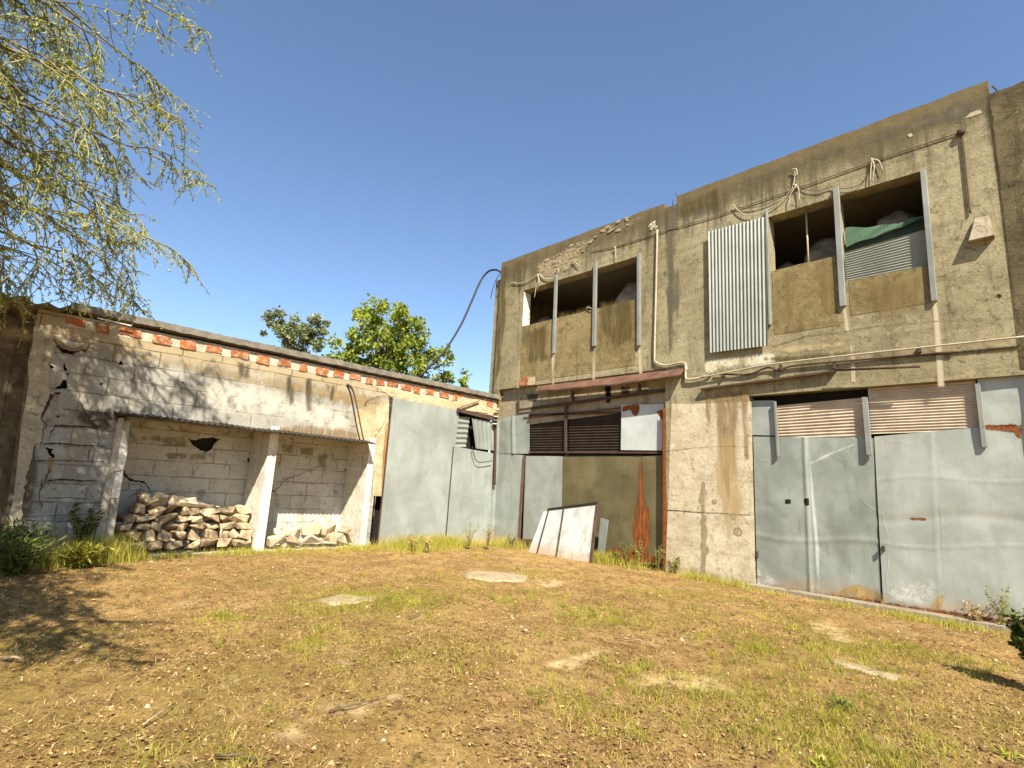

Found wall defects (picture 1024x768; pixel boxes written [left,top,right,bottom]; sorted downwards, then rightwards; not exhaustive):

flaking render [538,216,630,279]
crack [27,394,151,517]
rust [594,406,667,565]
rust [622,404,640,416]
rust [985,424,1022,438]